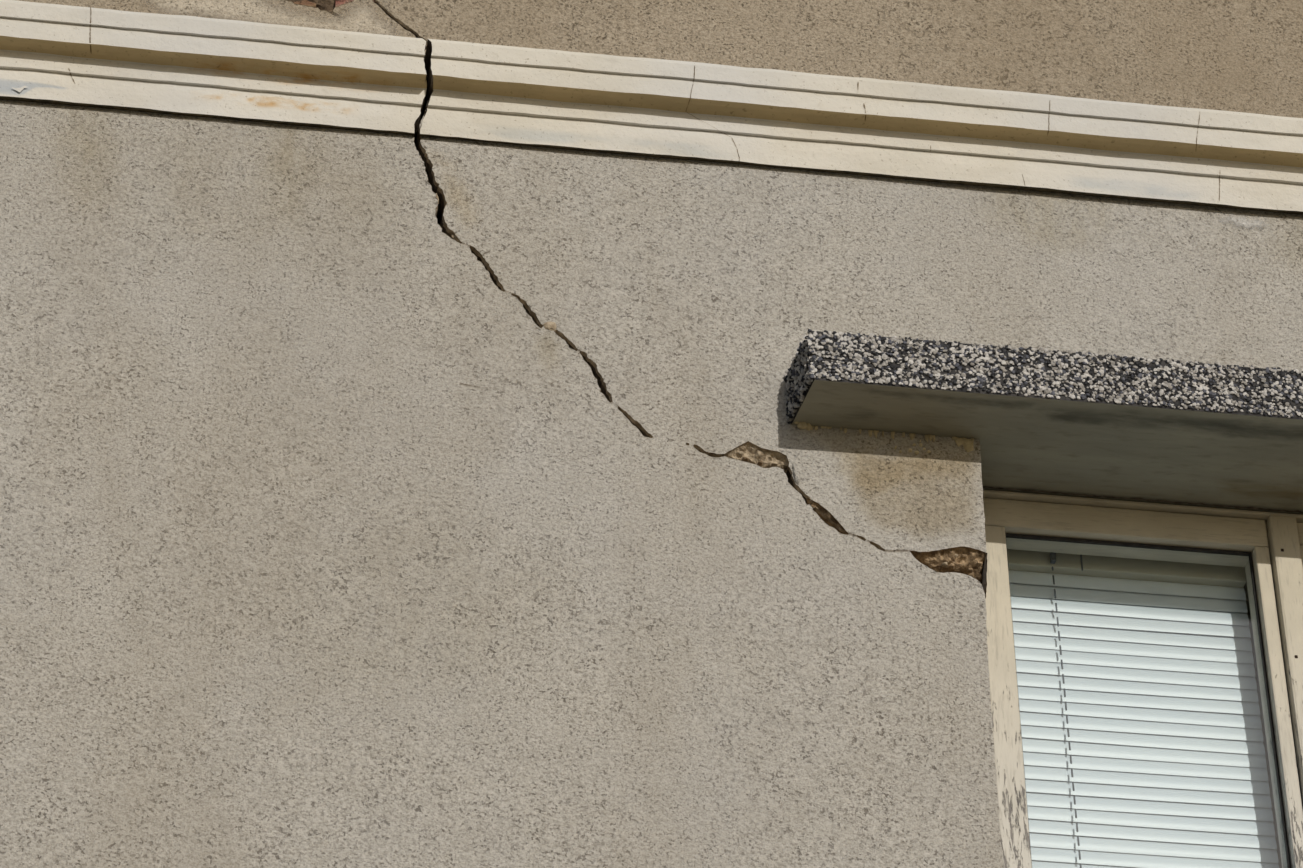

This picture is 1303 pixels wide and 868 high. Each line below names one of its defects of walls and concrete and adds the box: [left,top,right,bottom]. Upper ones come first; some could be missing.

flaking render [287,0,354,18]
crack [686,65,740,162]
crack [374,0,653,438]
crack [686,443,729,457]
crack [783,465,908,551]